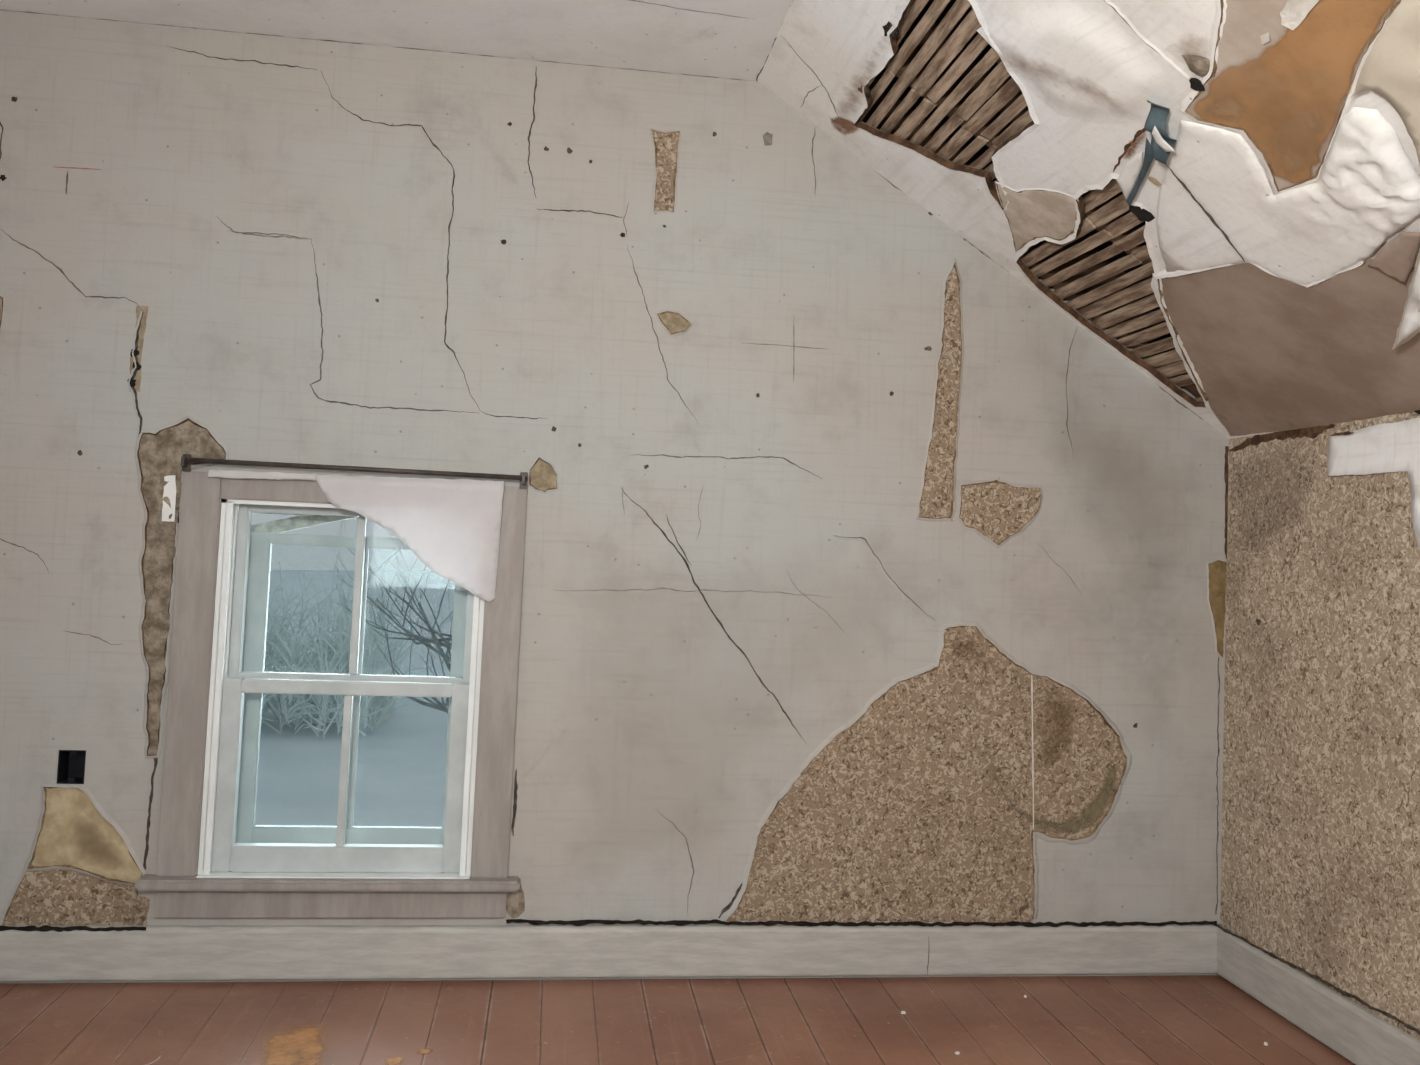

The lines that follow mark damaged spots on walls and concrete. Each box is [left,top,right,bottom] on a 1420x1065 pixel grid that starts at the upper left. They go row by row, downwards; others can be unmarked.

crack [0,10,538,441]
crack [398,0,845,744]
peeling [650,128,681,214]
peeling [655,309,693,336]
peeling [763,132,773,146]
peeling [851,0,1420,550]
peeling [527,456,559,494]
crack [0,538,49,572]
peeling [135,415,229,759]
peeling [1207,559,1227,657]
peeling [726,621,1132,923]
peeling [1,783,150,926]